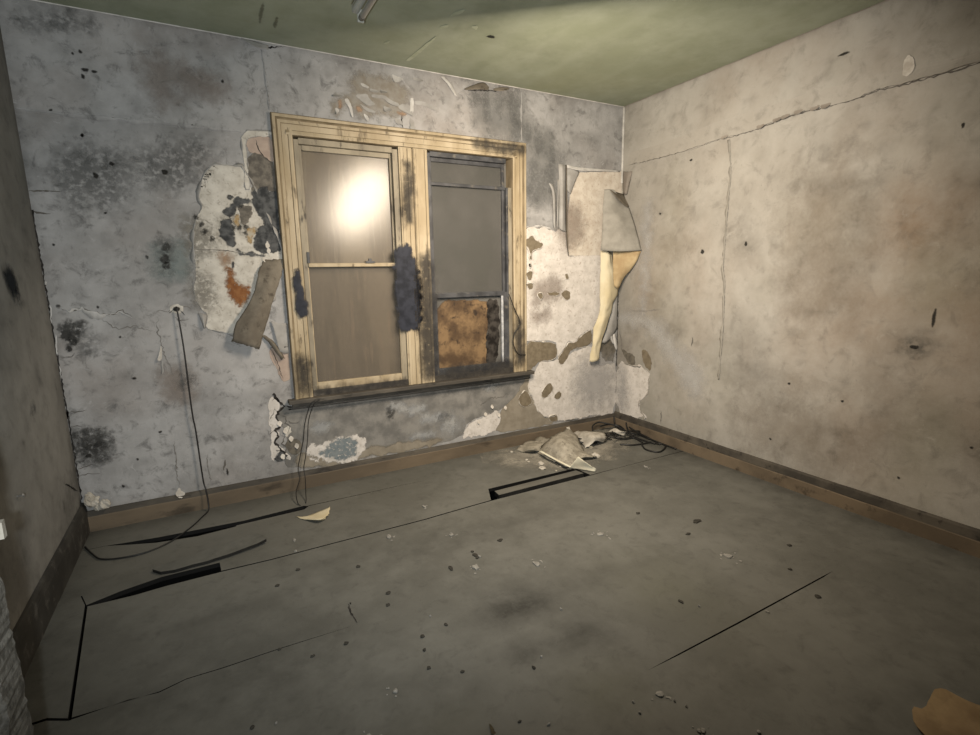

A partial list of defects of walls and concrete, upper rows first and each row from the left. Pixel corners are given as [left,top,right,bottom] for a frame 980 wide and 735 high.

flaking render [194,130,282,333]
corrosion [221,253,251,307]
leakage [59,321,84,351]
flaking render [275,179,652,467]
leakage [72,428,110,463]